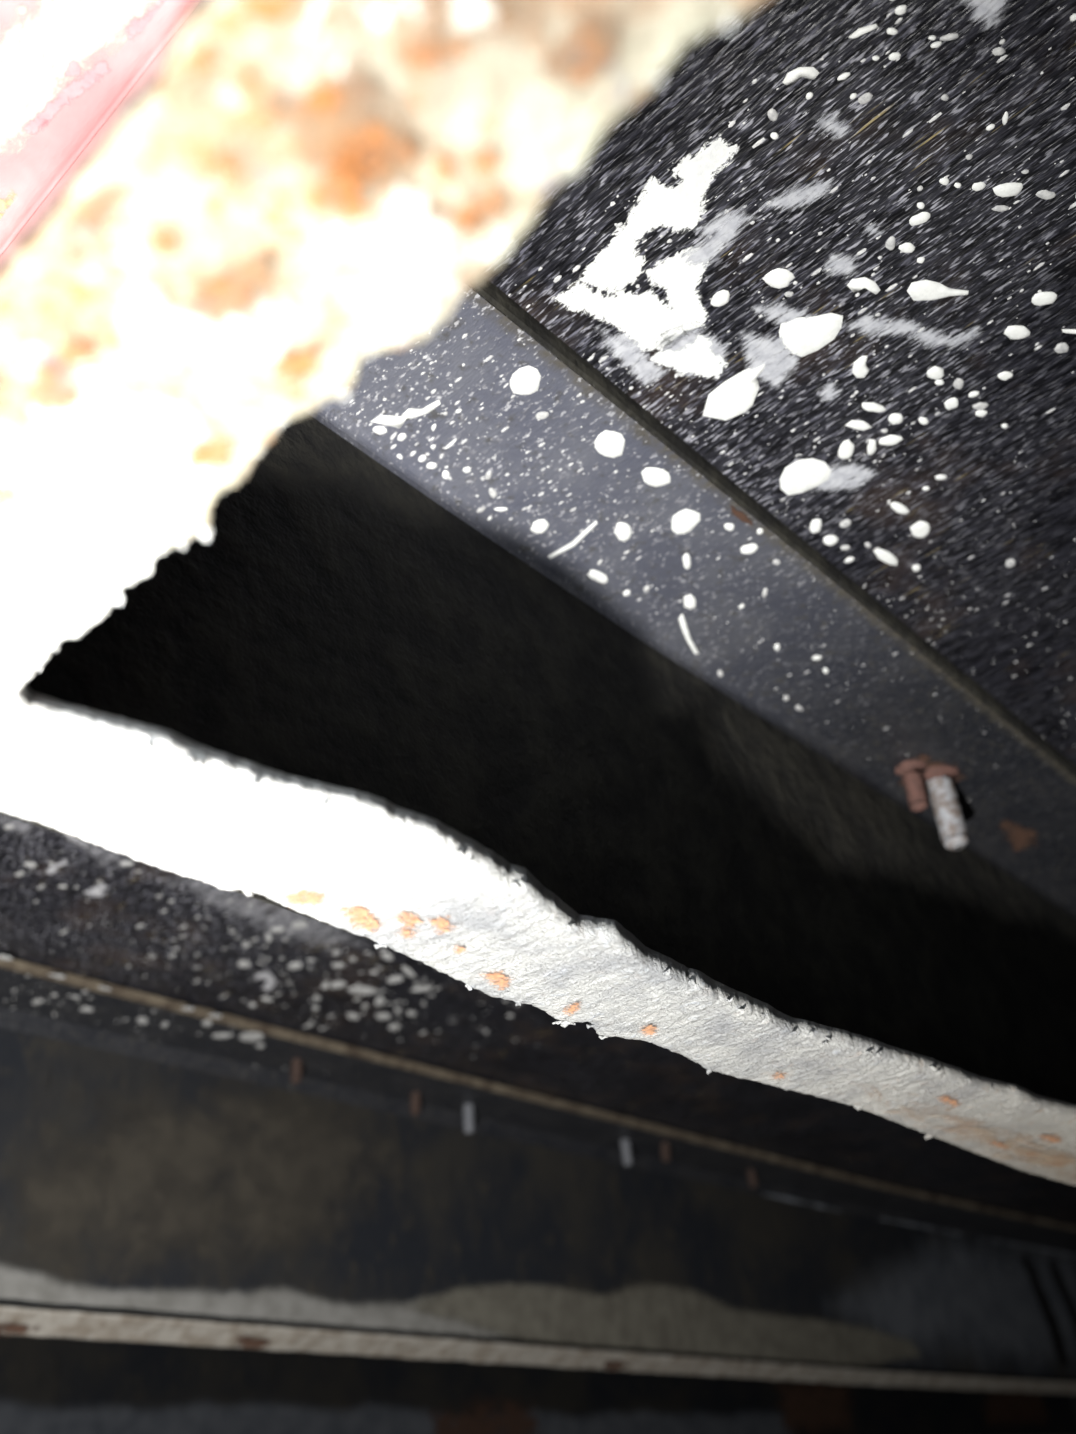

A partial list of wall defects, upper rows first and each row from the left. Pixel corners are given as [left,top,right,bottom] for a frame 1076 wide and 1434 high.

peeling [0,0,157,153]
corrosion [407,38,468,71]
corrosion [540,17,618,84]
corrosion [261,65,453,221]
corrosion [63,187,125,255]
corrosion [437,146,506,231]
corrosion [188,257,271,323]
corrosion [24,344,90,411]
corrosion [272,352,318,385]
corrosion [184,438,233,468]
corrosion [283,890,466,953]
corrosion [480,971,508,990]